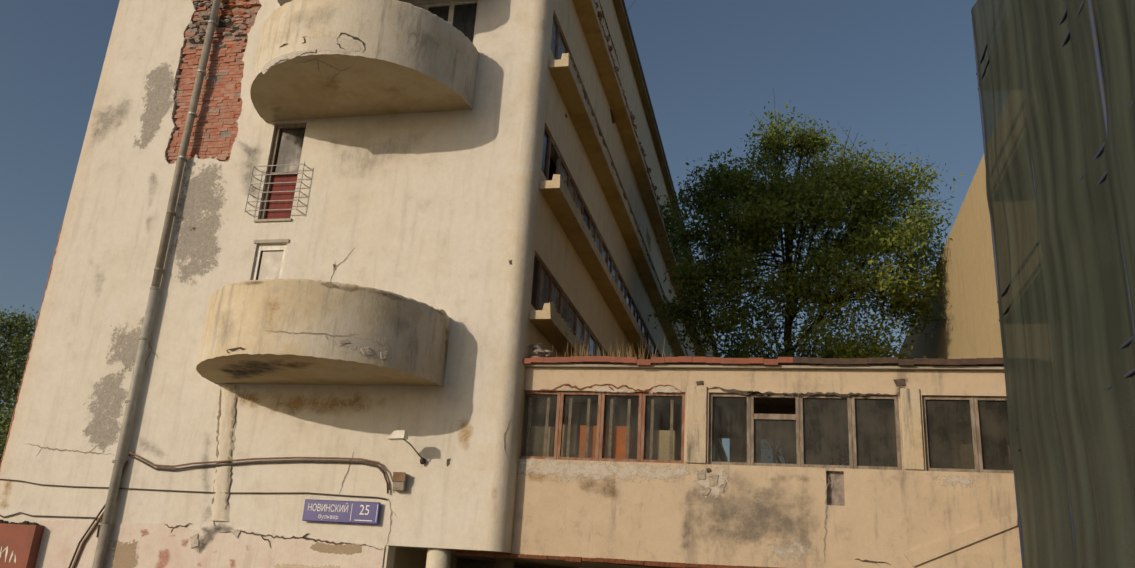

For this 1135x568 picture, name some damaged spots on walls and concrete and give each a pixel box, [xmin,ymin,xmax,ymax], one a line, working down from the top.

peeling [261,35,362,74]
flaking render [165,0,262,164]
water stain [175,164,226,283]
crack [227,330,359,353]
water stain [83,317,144,453]
water stain [223,362,298,377]
crack [30,443,113,456]
crack [164,386,396,550]
spalling [694,467,729,498]